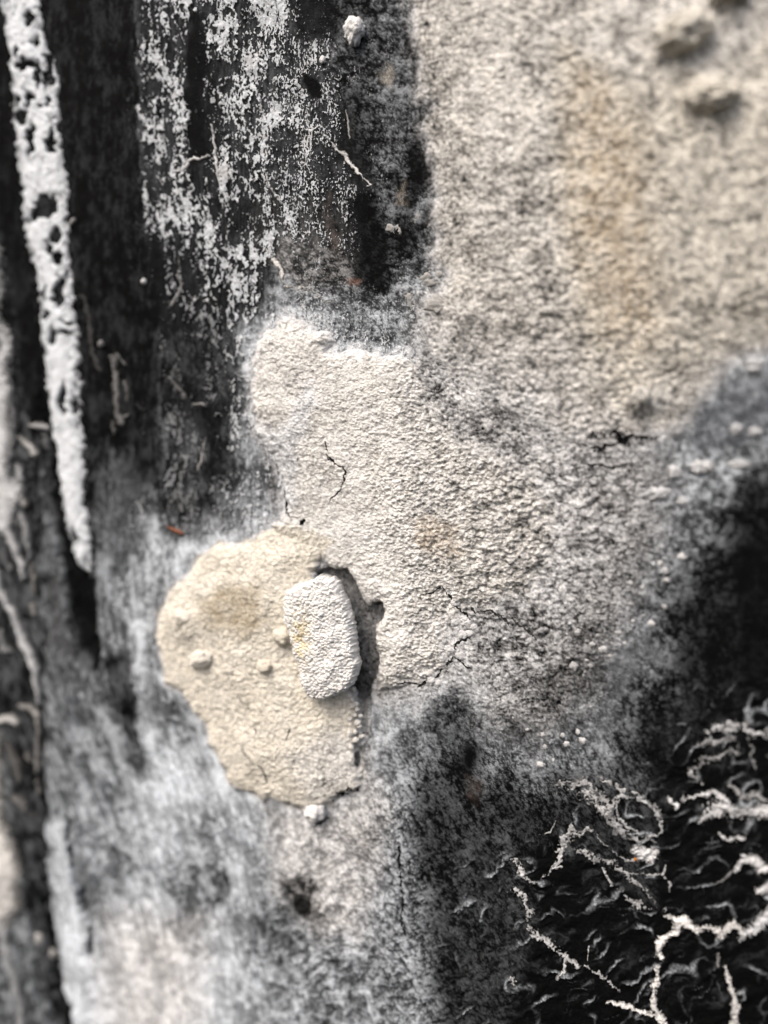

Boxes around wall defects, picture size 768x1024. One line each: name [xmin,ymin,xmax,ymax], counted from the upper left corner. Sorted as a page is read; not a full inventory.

crack [324,441,347,502]
crack [578,428,665,470]
crack [314,565,537,745]